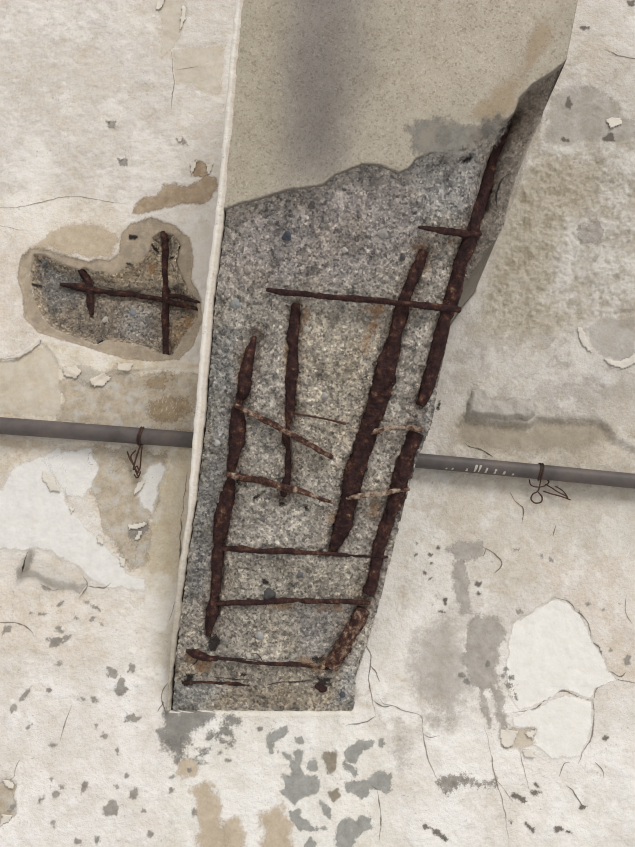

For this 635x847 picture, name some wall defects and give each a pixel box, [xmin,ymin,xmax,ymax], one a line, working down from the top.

water stain [407,114,507,158]
crack [0,196,114,230]
spalling [18,217,203,371]
spalling [172,70,560,711]
peeling [0,447,149,591]
peeling [134,463,166,514]
crack [346,646,441,786]
water stain [446,541,515,729]
crack [485,730,512,837]
spalling [511,782,541,803]
peeling [500,599,617,758]
crack [513,598,634,806]